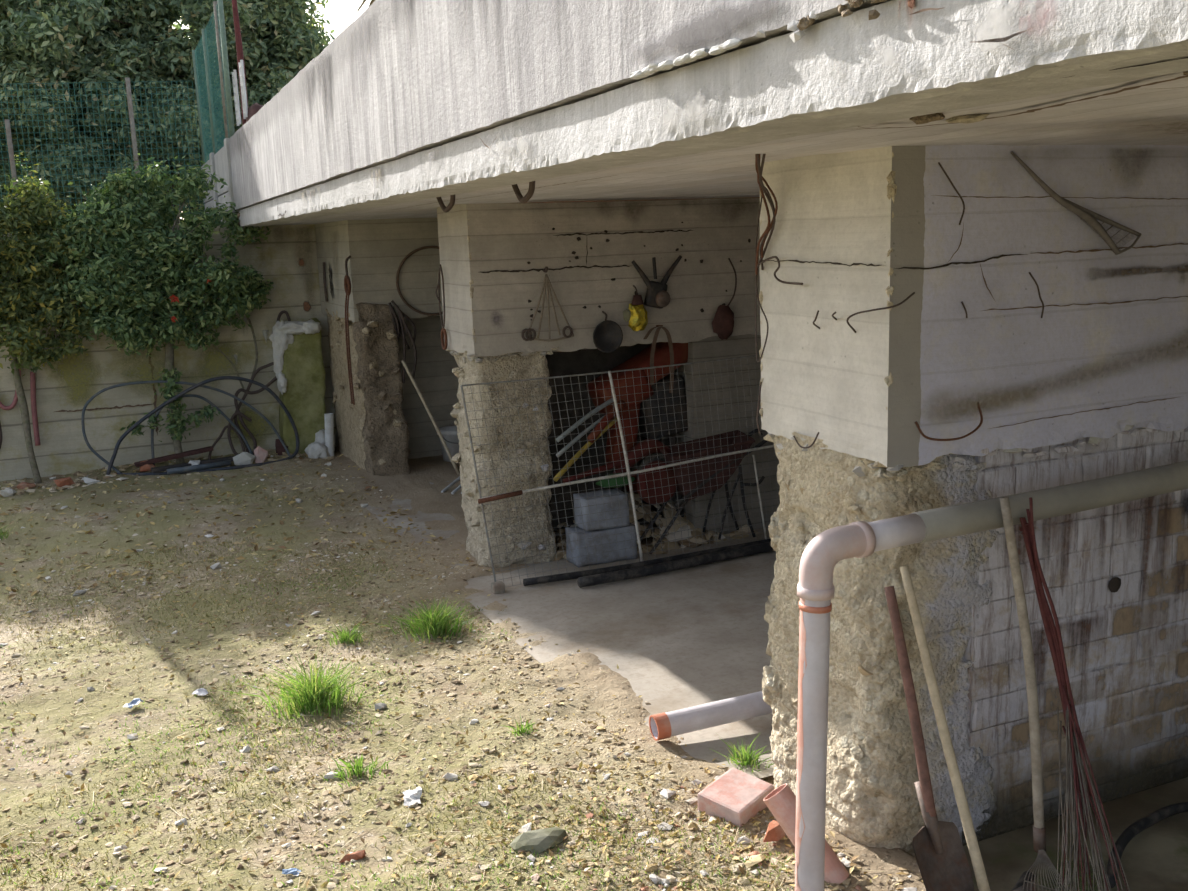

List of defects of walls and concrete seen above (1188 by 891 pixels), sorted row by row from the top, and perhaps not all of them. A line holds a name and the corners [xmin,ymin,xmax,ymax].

spalling [787,10,819,43]
spalling [837,0,888,20]
crack [974,26,1035,49]
flaking render [630,30,766,80]
crack [858,57,1188,129]
crack [759,195,1188,311]
damp [1106,265,1188,279]
spalling [325,302,411,476]
spalling [763,433,808,454]
spalling [450,403,487,527]
spalling [852,455,986,482]